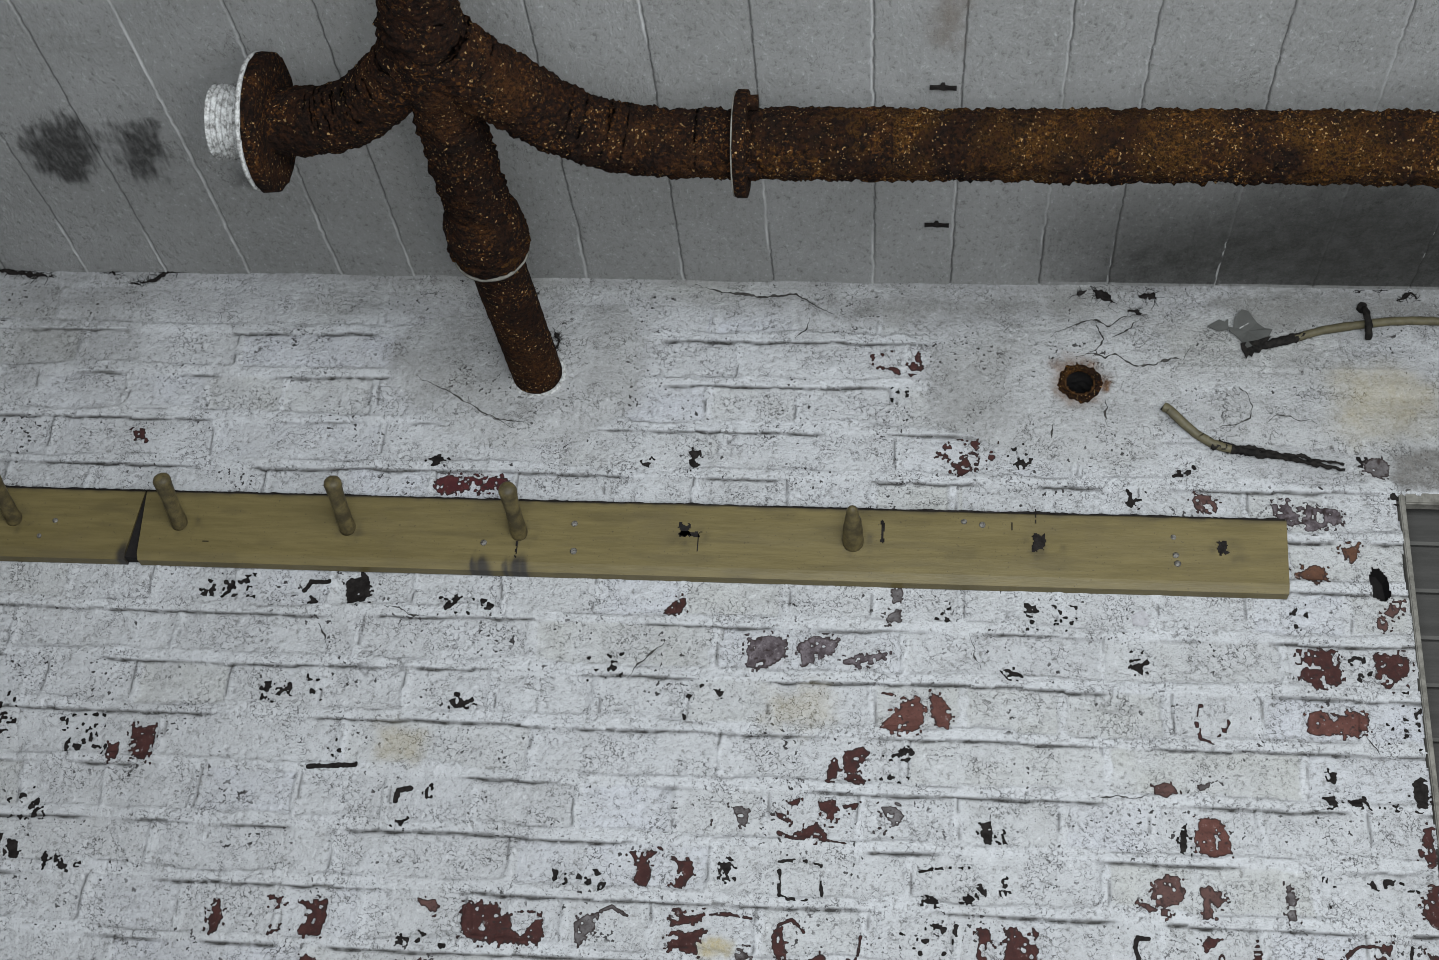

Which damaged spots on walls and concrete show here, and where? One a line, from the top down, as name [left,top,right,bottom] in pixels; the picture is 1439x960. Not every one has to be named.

crack [1051,314,1191,367]
rust [1057,364,1109,404]
peeling [742,630,892,672]
peeling [1293,647,1423,751]
peeling [60,712,158,765]
peeling [771,689,955,902]
peeling [1176,815,1234,859]
peeling [918,866,1012,906]
peeling [395,896,544,960]
peeling [771,918,826,960]
peeling [899,895,1039,960]
peeling [1133,874,1231,960]